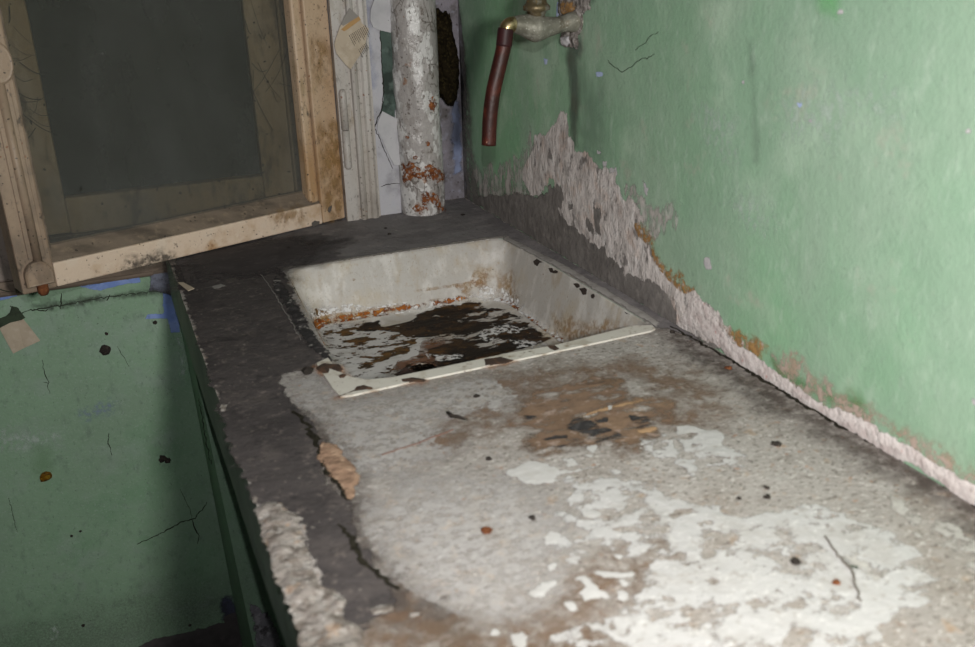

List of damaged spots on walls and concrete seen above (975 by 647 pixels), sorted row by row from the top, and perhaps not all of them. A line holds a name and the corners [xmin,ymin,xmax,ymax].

crack [608,32,658,72]
corrosion [401,156,446,214]
crack [0,291,159,319]
peeling [473,111,975,505]
water stain [577,361,718,426]
spalling [316,442,361,499]
crack [138,490,207,544]
spalling [252,496,365,647]
water stain [289,370,618,647]
peeling [506,445,975,647]
crack [824,535,862,602]
peeling [490,629,529,647]